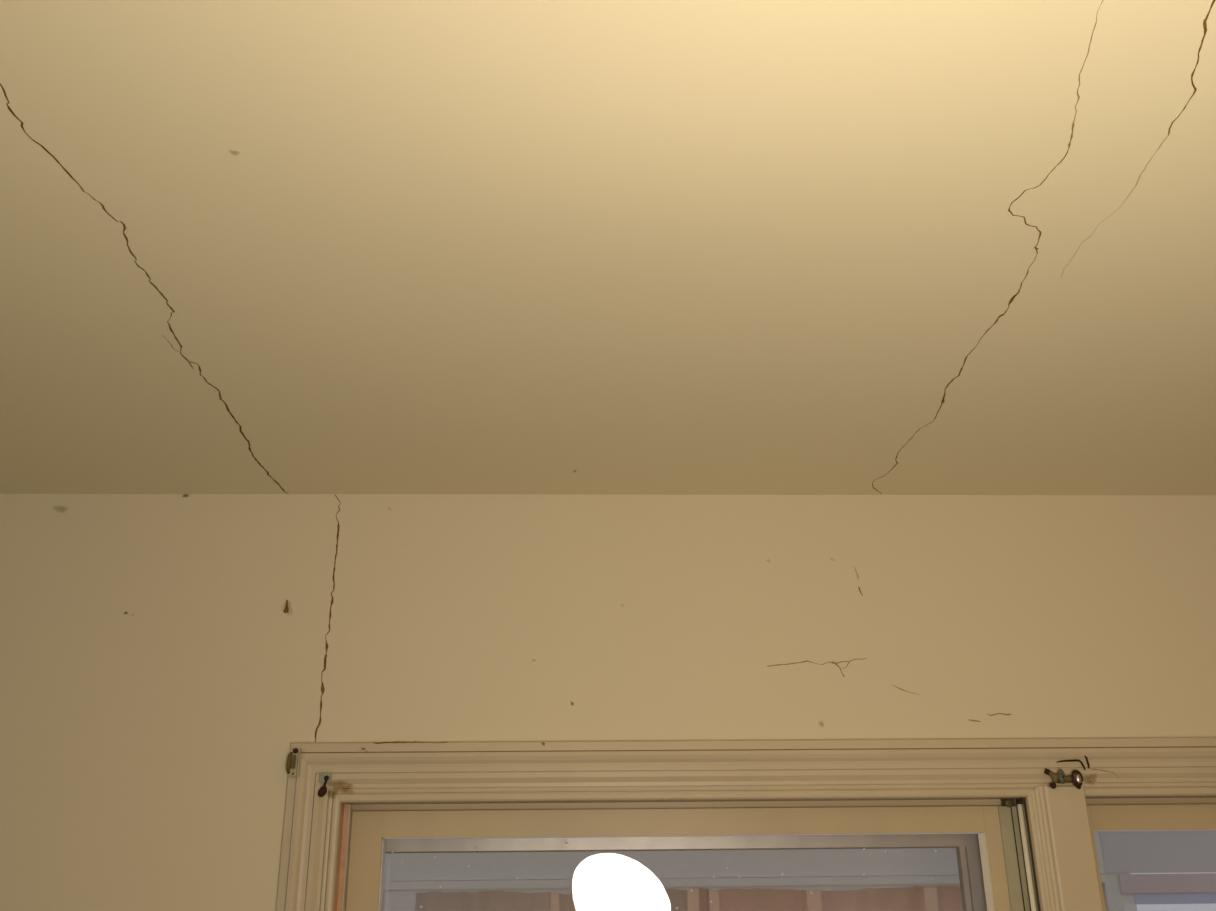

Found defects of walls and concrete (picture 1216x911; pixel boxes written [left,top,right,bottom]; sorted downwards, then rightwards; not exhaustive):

crack [0,84,288,494]
crack [872,1,1103,494]
crack [1061,0,1216,277]
crack [315,495,341,742]
crack [767,658,867,677]